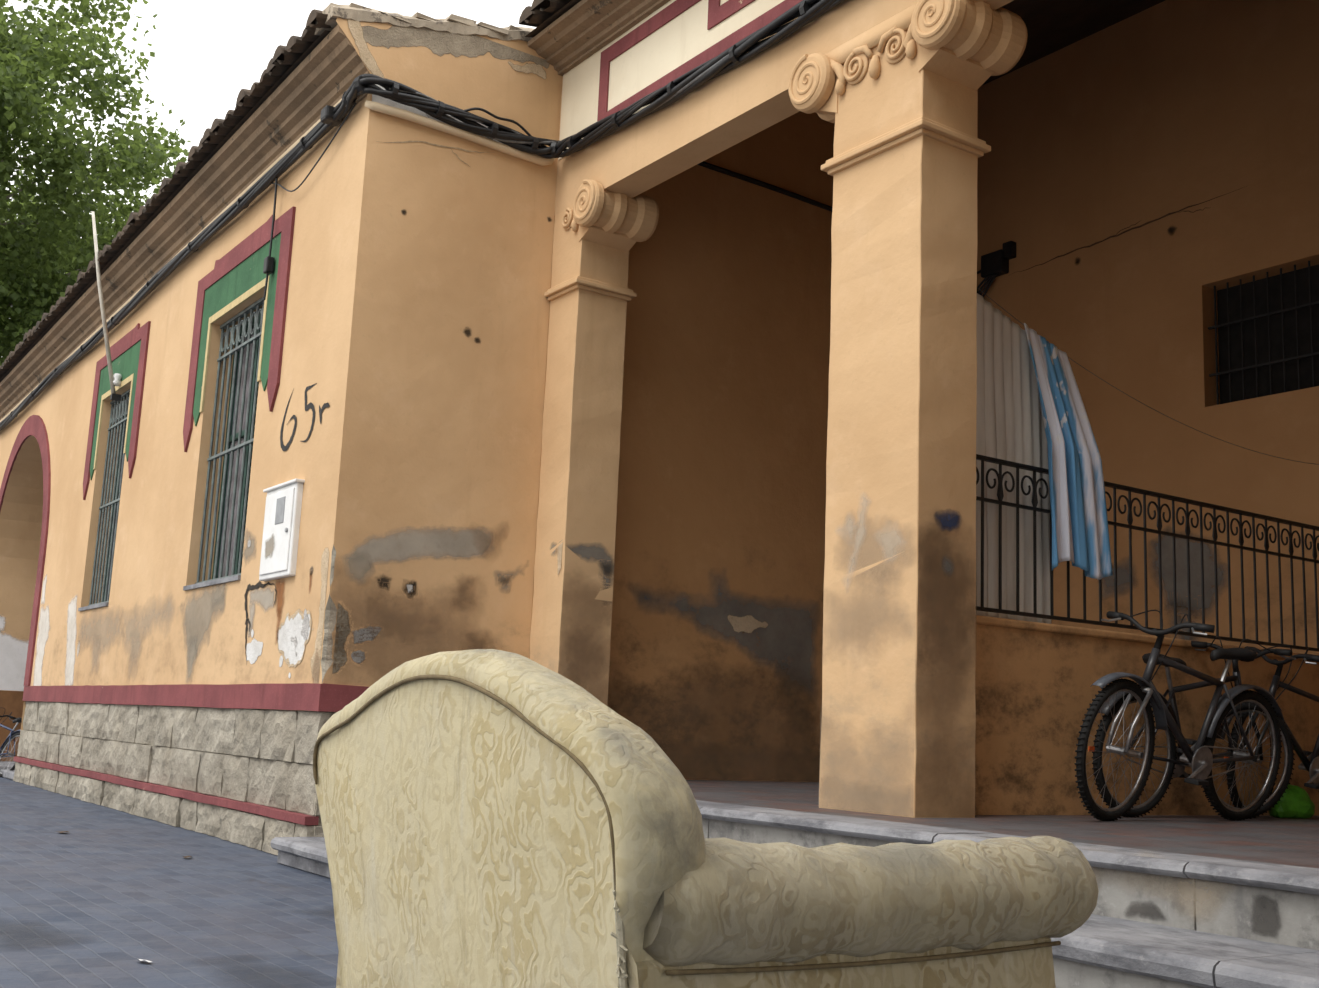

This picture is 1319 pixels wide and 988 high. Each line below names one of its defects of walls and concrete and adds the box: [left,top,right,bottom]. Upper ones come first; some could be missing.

flaking render [348,19,549,143]
crack [1012,187,1244,274]
peeling [0,575,50,691]
flaking render [65,597,80,686]
damp [82,585,225,678]
spalling [246,544,382,683]
damp [638,585,815,692]